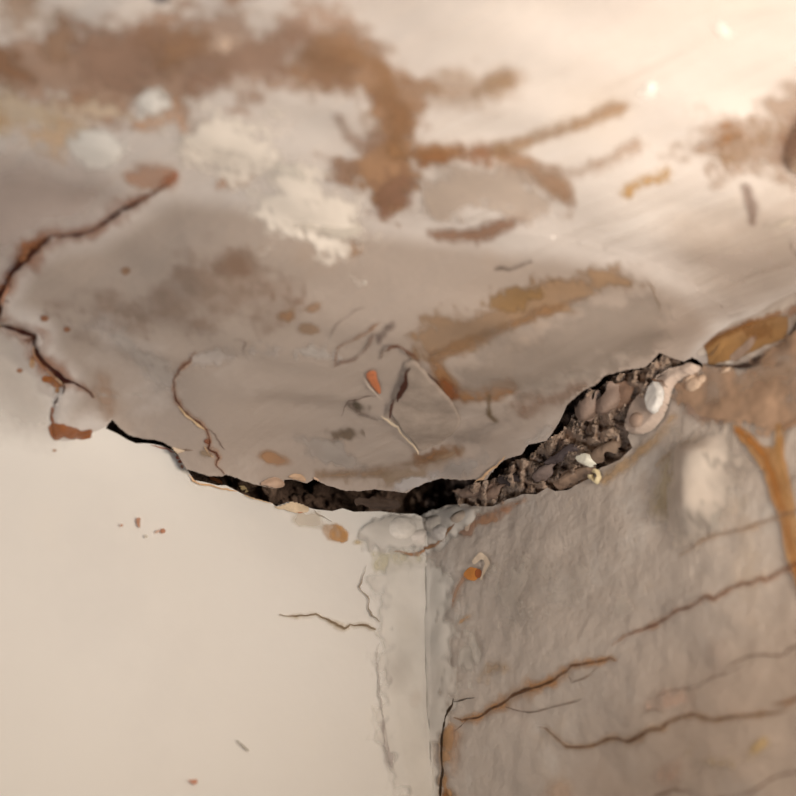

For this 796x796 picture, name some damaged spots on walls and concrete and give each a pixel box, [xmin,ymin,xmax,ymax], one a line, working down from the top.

leakage [0,0,572,217]
leakage [558,104,626,133]
leakage [697,89,796,171]
leakage [432,217,523,242]
crack [0,184,170,406]
crack [702,323,796,369]
corrosion [705,306,796,365]
crack [173,352,225,475]
spalling [106,331,796,516]
corrosion [733,425,796,580]
crack [280,565,380,630]
crack [439,563,796,796]